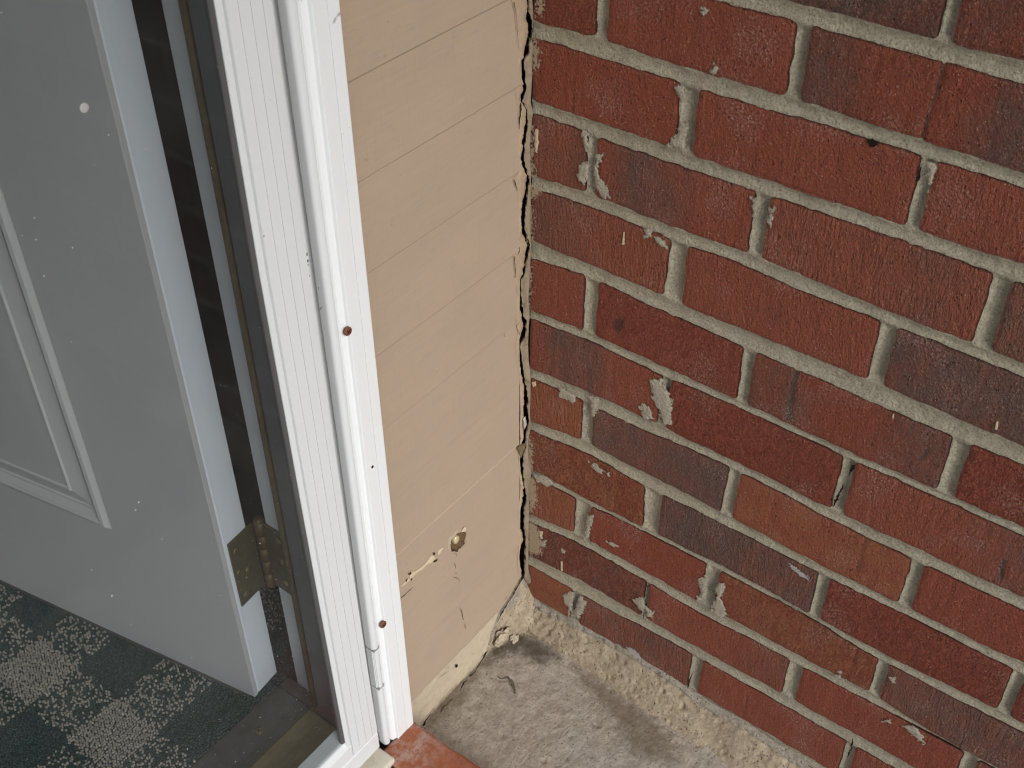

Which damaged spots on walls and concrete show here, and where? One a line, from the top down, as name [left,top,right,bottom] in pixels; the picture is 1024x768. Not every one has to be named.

peeling [401,527,466,587]
crack [497,0,535,622]